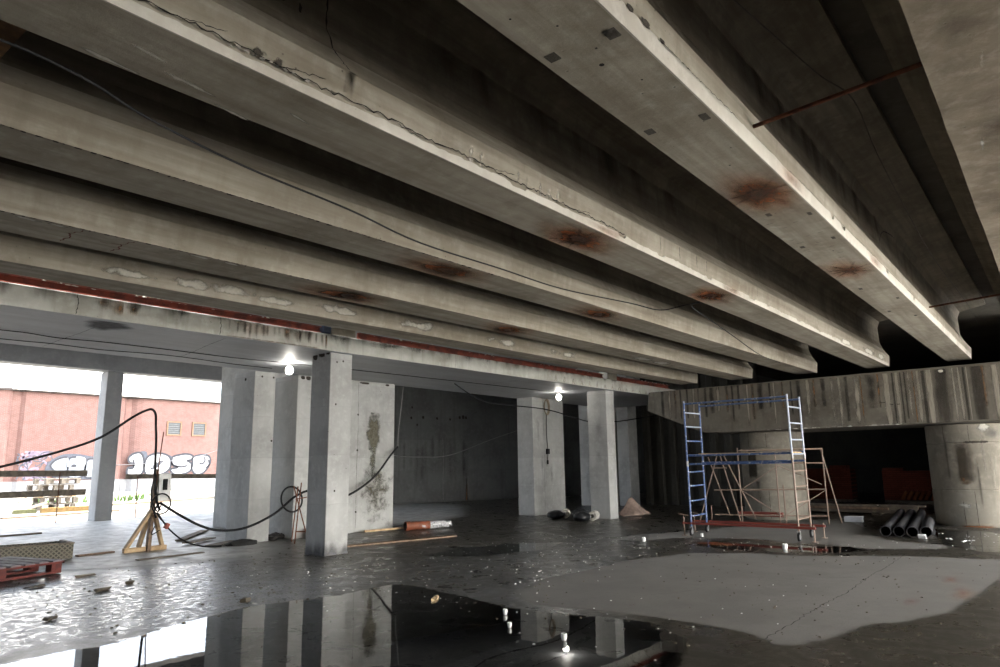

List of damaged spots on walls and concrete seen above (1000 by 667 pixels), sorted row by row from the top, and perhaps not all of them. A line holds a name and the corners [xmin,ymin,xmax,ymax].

crack [138,0,625,235]
rust [732,180,787,207]
rust [554,229,603,251]
peeling [108,268,156,279]
rust [413,262,472,277]
peeling [178,278,244,295]
peeling [260,297,292,306]
rust [318,290,372,301]
rust [696,291,725,301]
peeling [324,305,356,316]
peeling [401,321,432,330]
water stain [362,412,388,509]